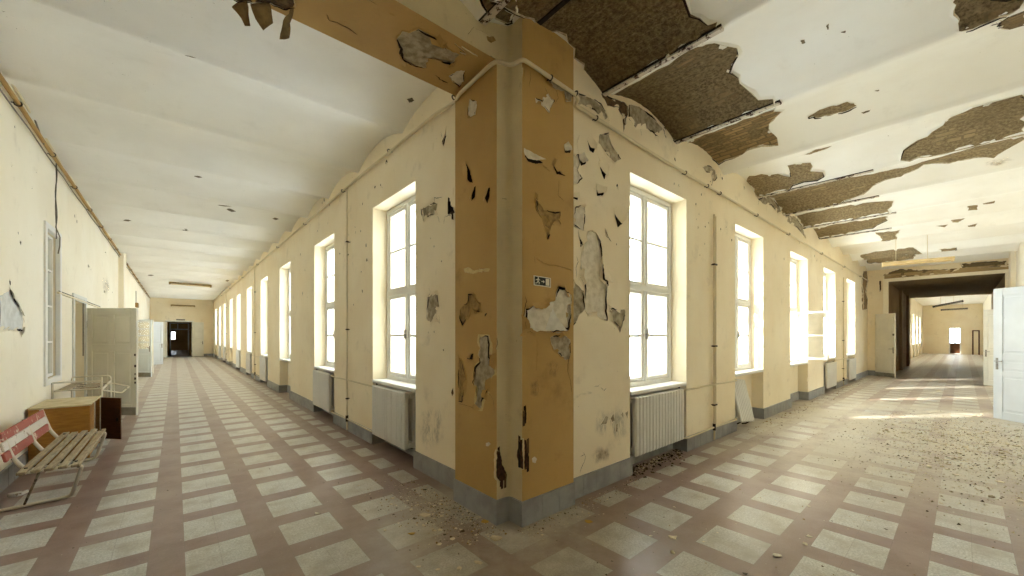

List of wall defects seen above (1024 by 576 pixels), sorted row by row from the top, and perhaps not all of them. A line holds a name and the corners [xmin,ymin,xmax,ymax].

peeling [234,0,298,11]
peeling [396,27,466,87]
peeling [460,161,490,203]
peeling [520,77,665,360]
peeling [758,196,821,238]
peeling [0,280,25,337]
peeling [427,290,439,334]
peeling [459,292,487,327]
peeling [861,260,1009,310]
peeling [451,334,497,411]
spalling [486,405,537,489]